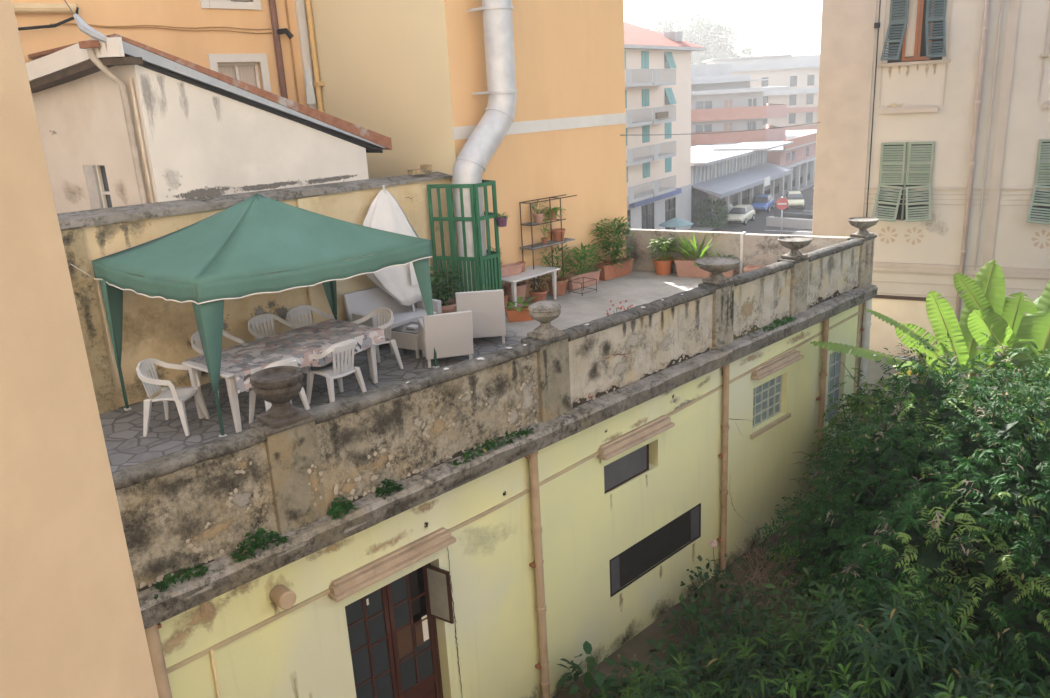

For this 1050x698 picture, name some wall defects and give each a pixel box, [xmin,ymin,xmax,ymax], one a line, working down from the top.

leakage [623,300,699,332]
leakage [583,341,610,378]
leakage [152,476,187,496]
leakage [205,459,264,493]
leakage [125,516,149,547]
leakage [144,557,190,578]